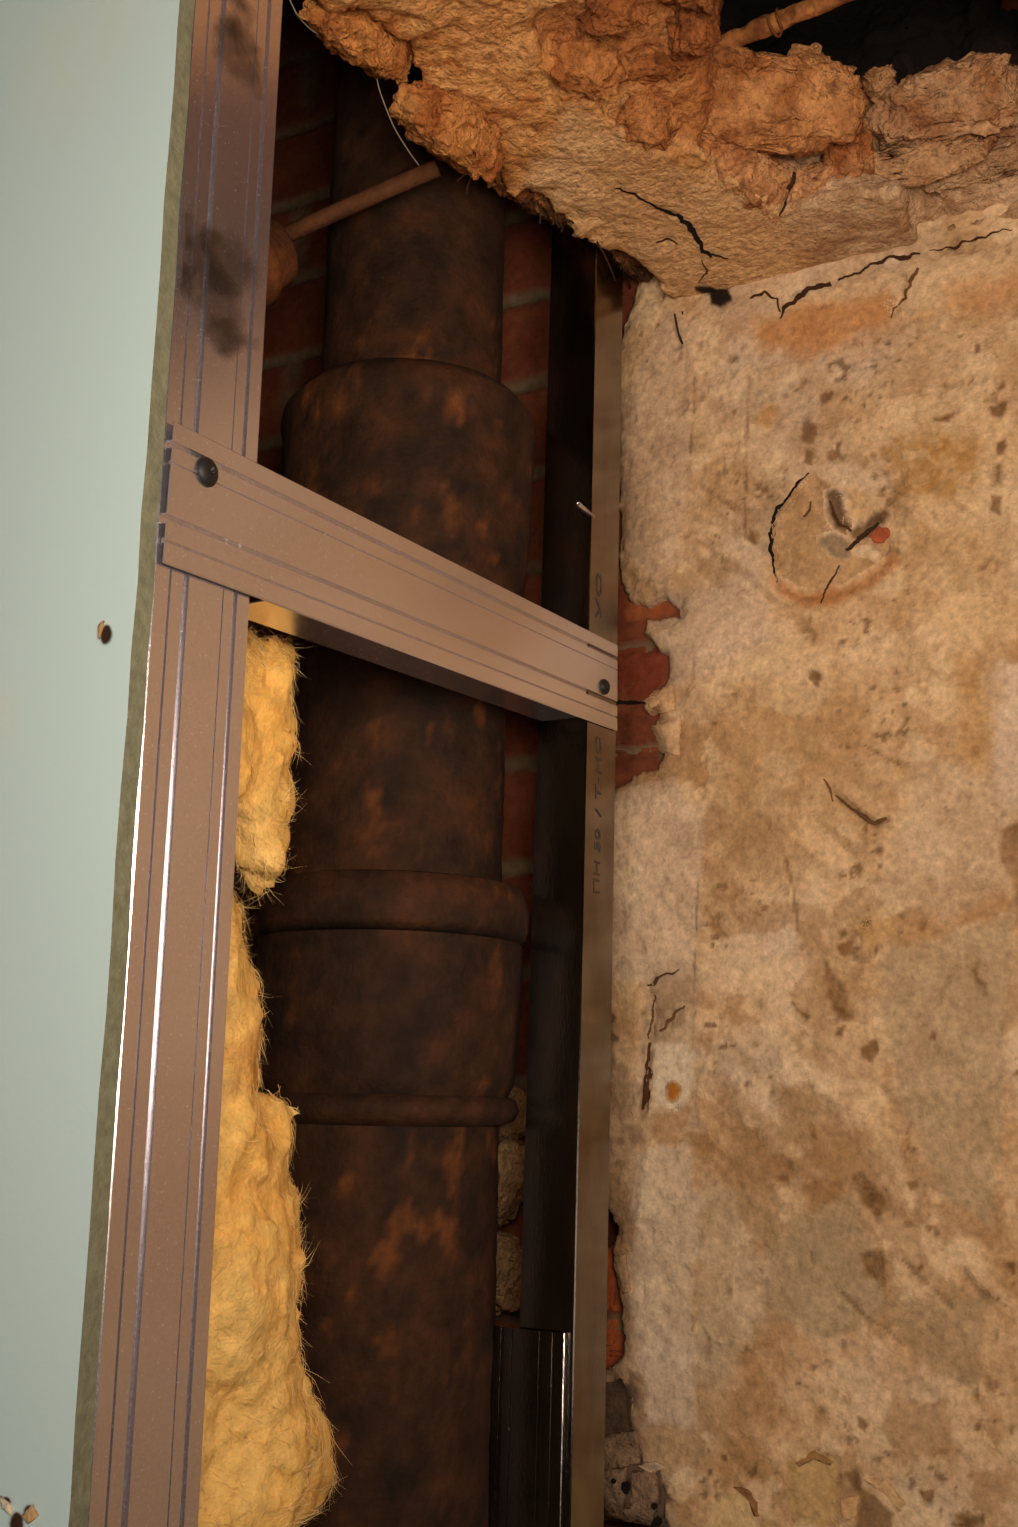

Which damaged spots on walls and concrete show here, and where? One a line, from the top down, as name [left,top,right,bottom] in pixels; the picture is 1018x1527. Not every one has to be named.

spalling [548,0,1018,223]
crack [615,188,729,283]
crack [779,171,796,216]
crack [750,229,1012,319]
crack [768,472,812,582]
crack [820,565,840,603]
spalling [615,591,682,789]